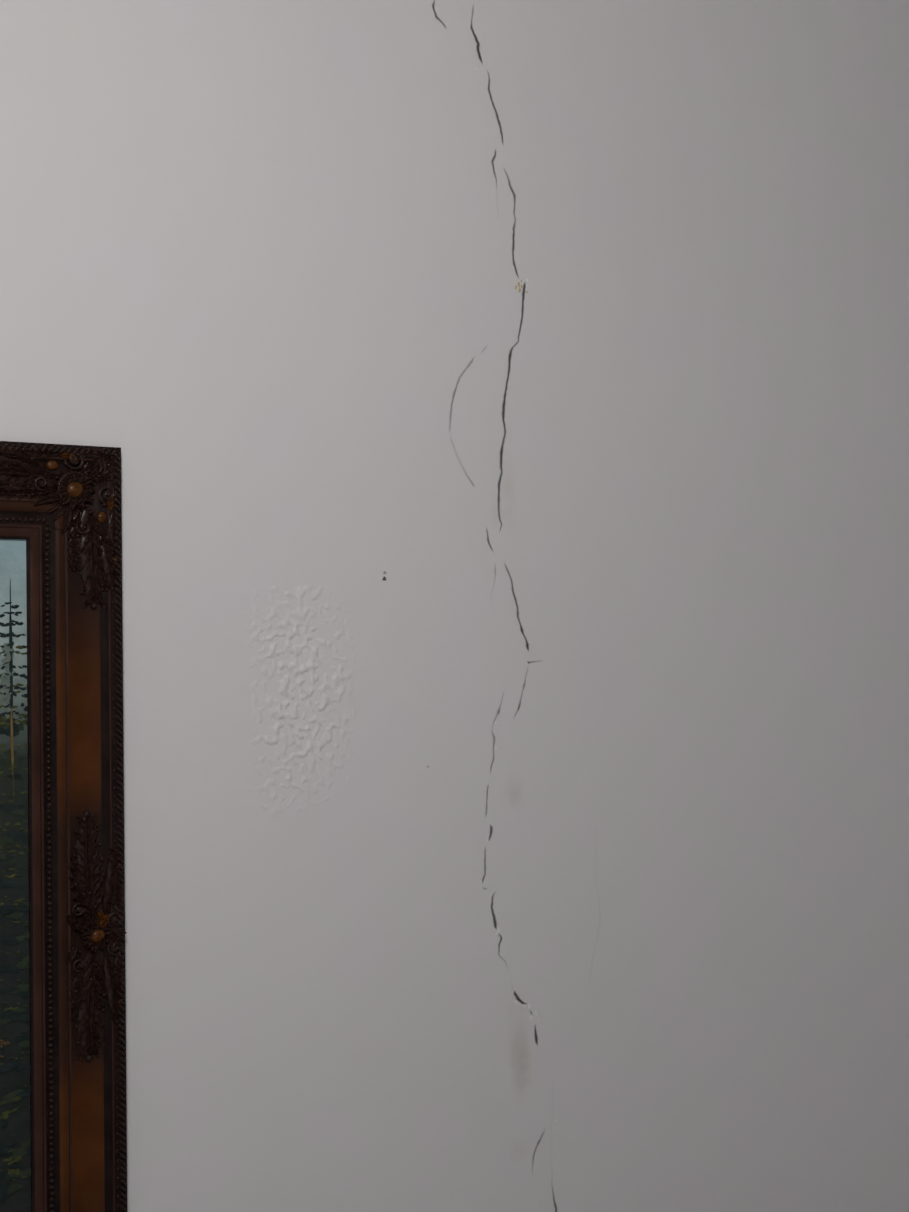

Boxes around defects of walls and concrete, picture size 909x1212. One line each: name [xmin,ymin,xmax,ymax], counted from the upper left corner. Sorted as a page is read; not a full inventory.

crack [433,3,529,547]
crack [511,580,531,663]
crack [483,877,504,945]
crack [514,992,540,1043]